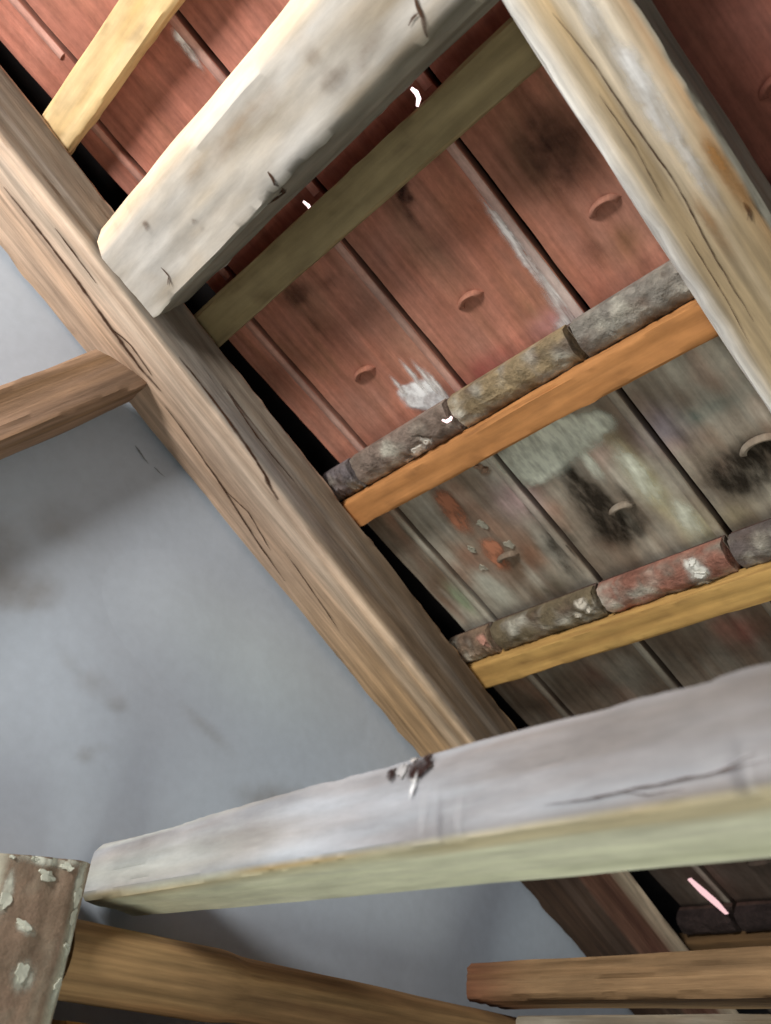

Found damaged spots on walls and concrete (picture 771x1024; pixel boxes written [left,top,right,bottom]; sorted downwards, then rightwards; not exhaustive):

crack [558,20,753,342]
crack [5,189,336,626]
leakage [393,365,448,410]
leakage [499,411,613,485]
leakage [623,455,657,496]
leakage [676,504,696,528]
crack [553,753,759,804]
peeling [0,874,13,910]
peeling [16,918,32,933]
peeling [31,856,85,959]
peeling [14,963,32,987]
peeling [51,978,62,1011]